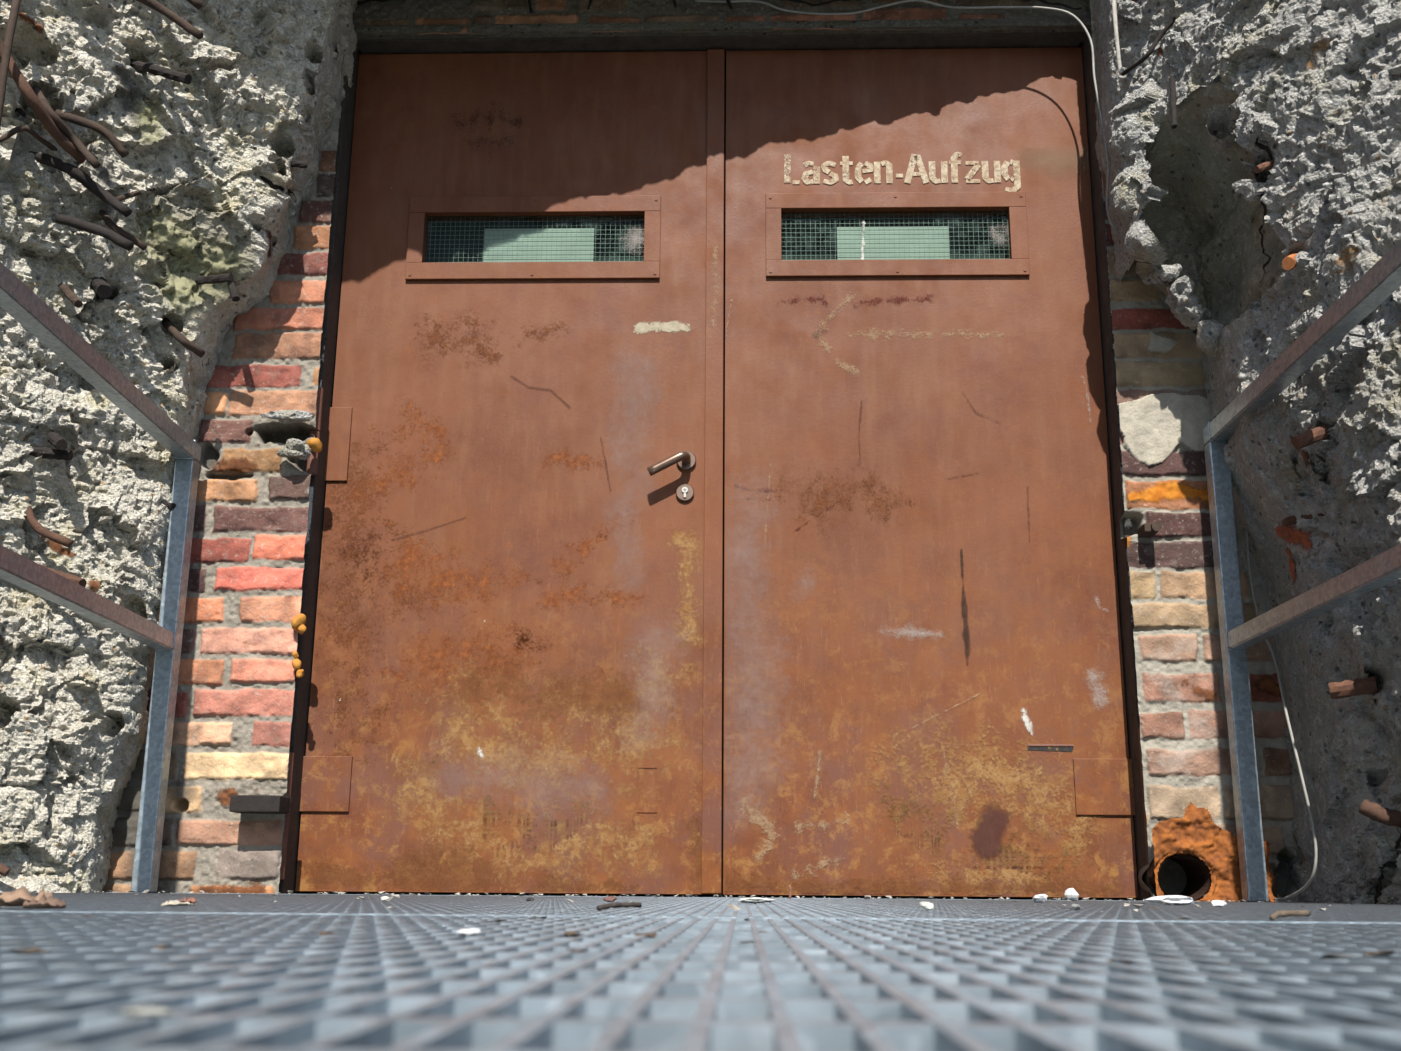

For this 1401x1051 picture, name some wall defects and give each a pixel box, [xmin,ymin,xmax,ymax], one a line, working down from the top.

corrosion [18,12,43,34]
spalling [1205,103,1239,154]
spalling [1245,148,1276,183]
corrosion [1128,481,1209,502]